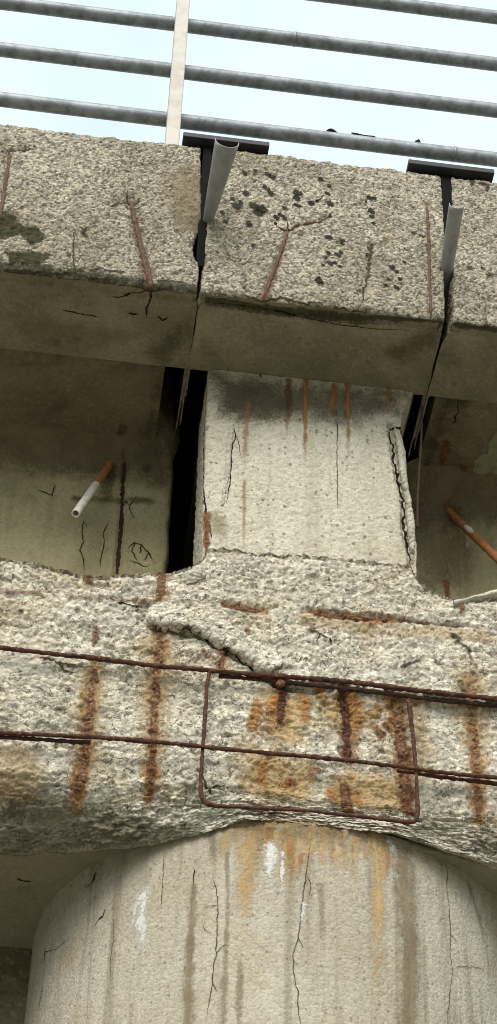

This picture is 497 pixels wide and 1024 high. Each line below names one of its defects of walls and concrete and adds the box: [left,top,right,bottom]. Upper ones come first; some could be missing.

crack [203,369,265,554]
corrosion [284,378,308,449]
leakage [212,374,398,423]
crack [389,426,411,566]
peeling [184,565,206,585]
peeling [0,572,497,825]
corrosion [239,679,416,816]
leakage [131,887,149,951]
leakage [184,882,196,1024]
crack [193,870,224,1019]
crack [292,841,311,1024]
corrosion [221,820,418,1024]